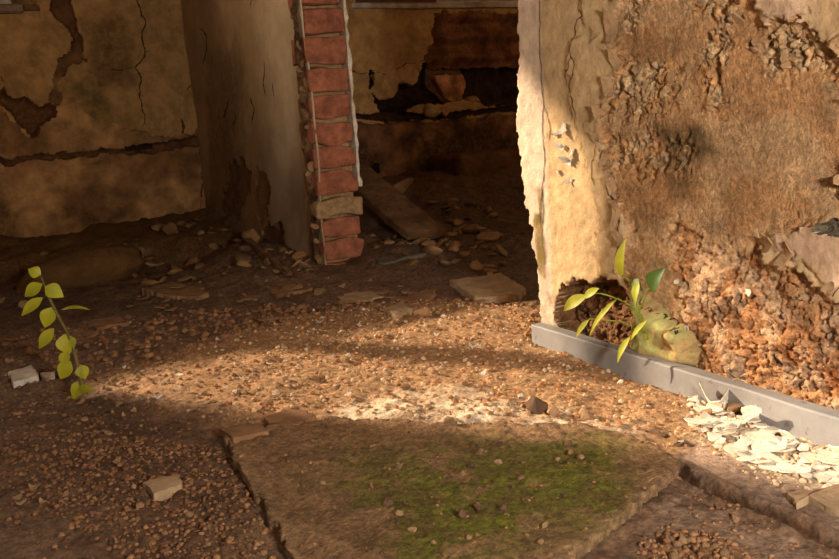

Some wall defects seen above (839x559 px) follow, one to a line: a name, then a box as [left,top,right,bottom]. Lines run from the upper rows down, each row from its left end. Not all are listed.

crack [0,0,203,208]
spalling [337,0,520,186]
spalling [222,156,285,245]
spalling [552,0,839,411]
peeling [741,405,762,423]
crack [679,464,839,551]